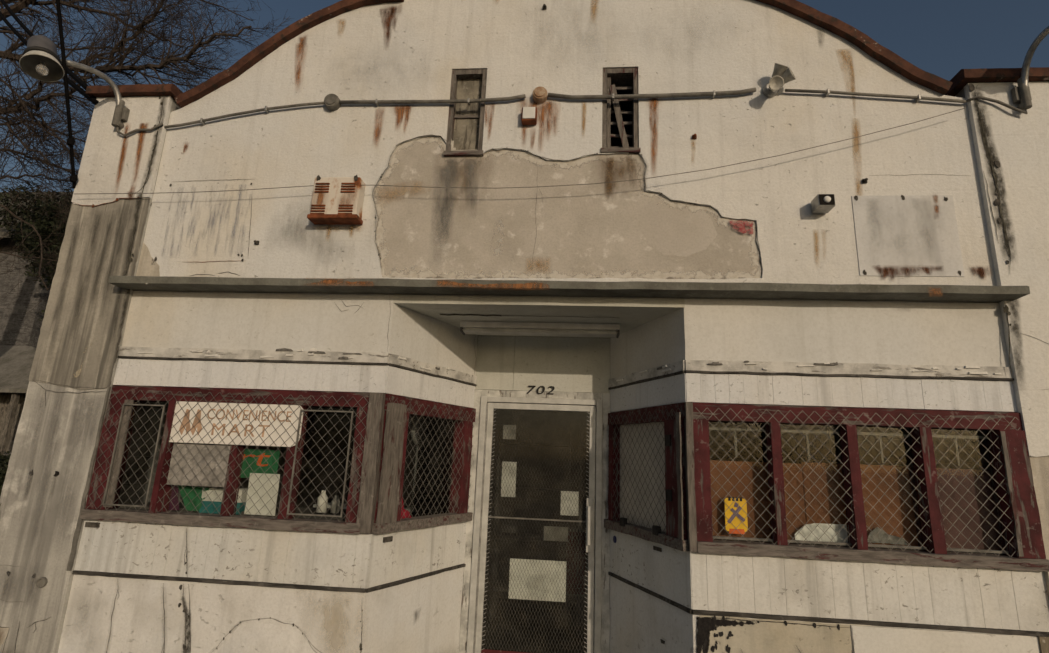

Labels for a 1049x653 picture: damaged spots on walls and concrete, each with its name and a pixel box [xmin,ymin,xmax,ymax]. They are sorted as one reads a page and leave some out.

rust [385,7,396,39]
rust [395,107,409,125]
rust [523,101,556,143]
rust [118,125,146,180]
crack [872,83,1011,264]
damp [975,92,1012,249]
spalling [374,136,762,279]
rust [876,267,912,278]
peeling [260,348,325,358]
crack [1003,301,1048,379]
crack [161,529,322,653]
spalling [696,615,852,653]